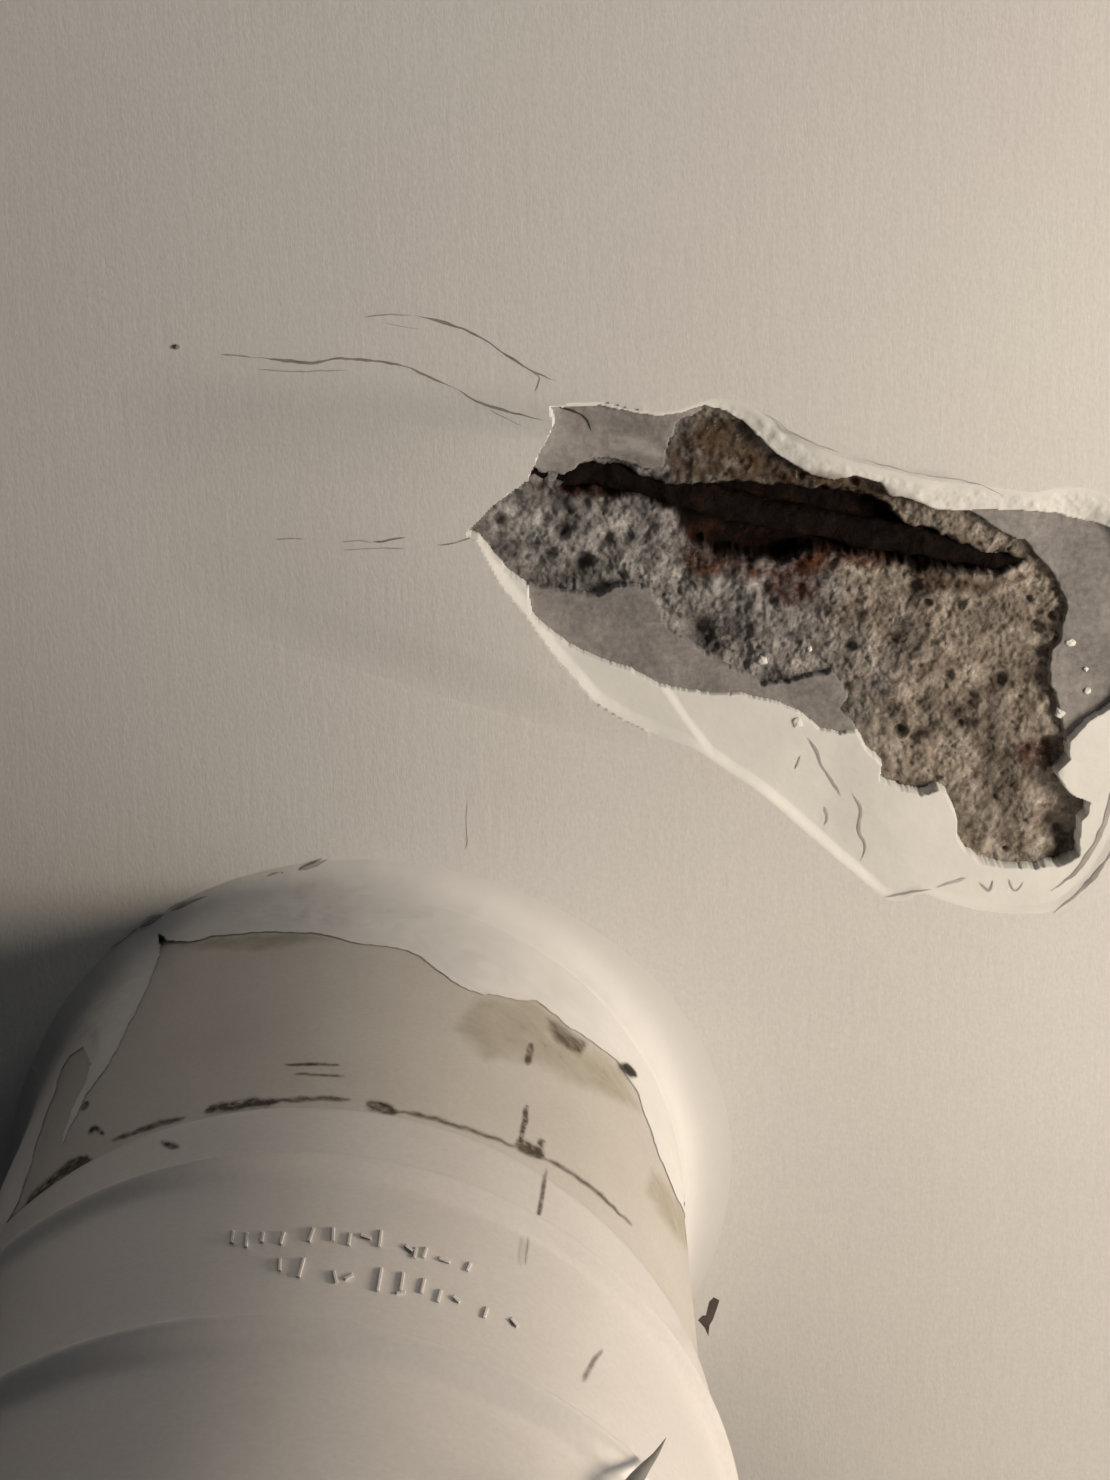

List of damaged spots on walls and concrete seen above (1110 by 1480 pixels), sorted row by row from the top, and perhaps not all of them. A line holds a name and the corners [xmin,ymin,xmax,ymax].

crack [222,314,591,430]
rust [670,417,903,498]
rust [684,546,878,605]
spalling [466,398,1110,914]